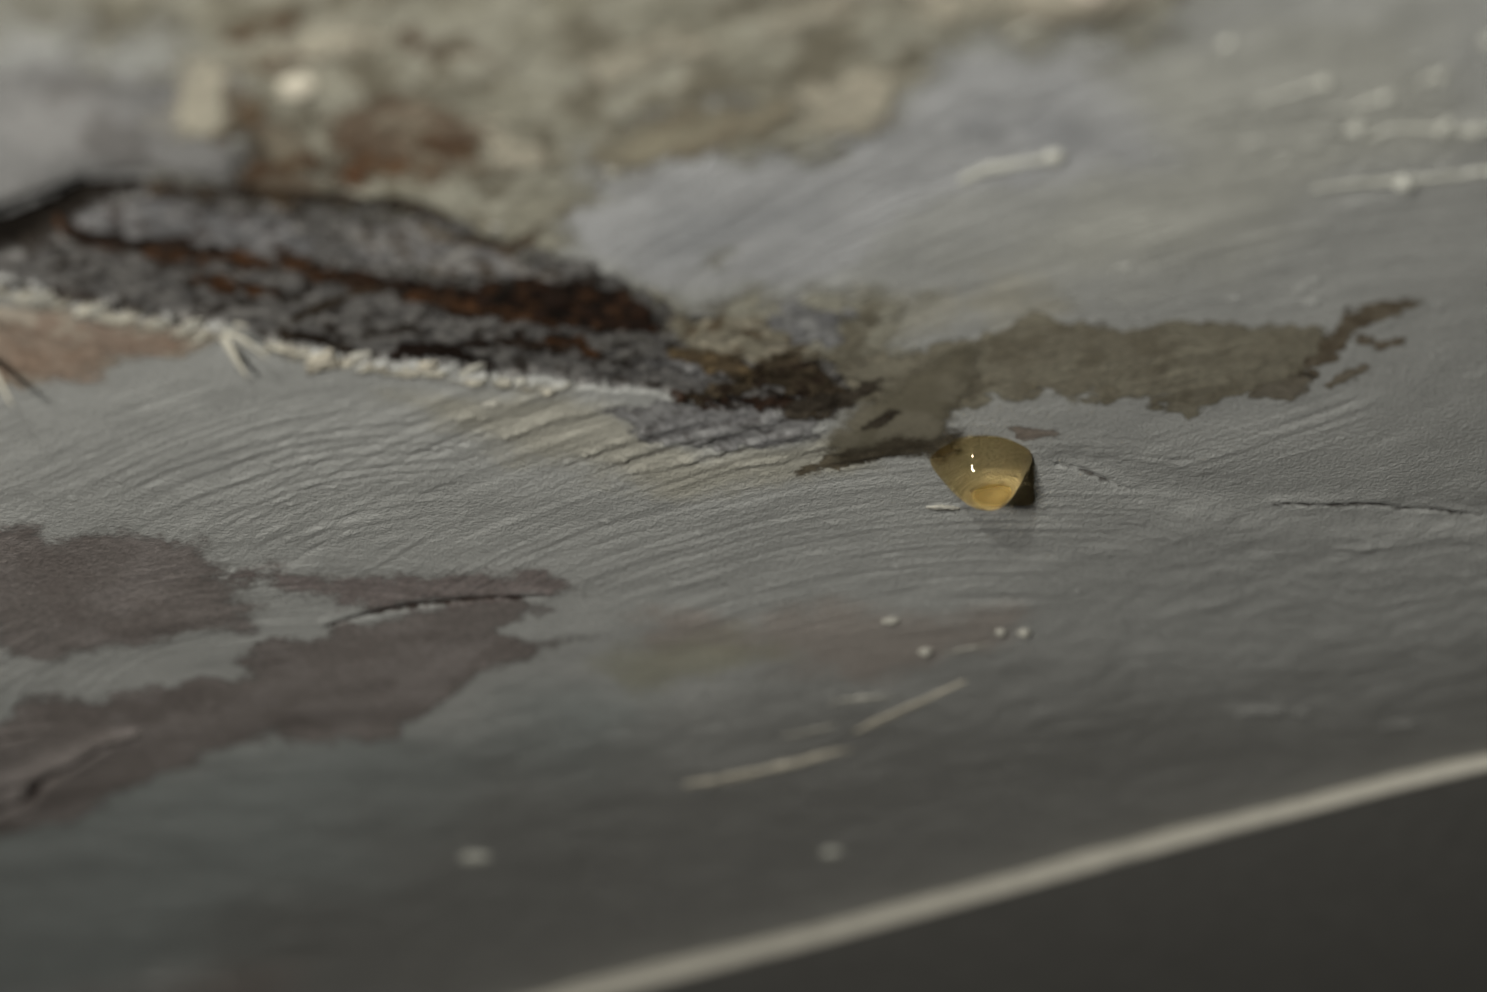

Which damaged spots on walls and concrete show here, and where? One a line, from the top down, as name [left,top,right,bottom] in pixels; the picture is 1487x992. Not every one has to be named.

damp [27,0,1181,270]
damp [0,306,215,388]
crack [0,177,547,327]
rust [55,214,664,359]
spalling [0,179,858,452]
rust [664,348,848,418]
damp [612,286,1424,475]
crack [1274,503,1461,514]
damp [0,525,570,836]